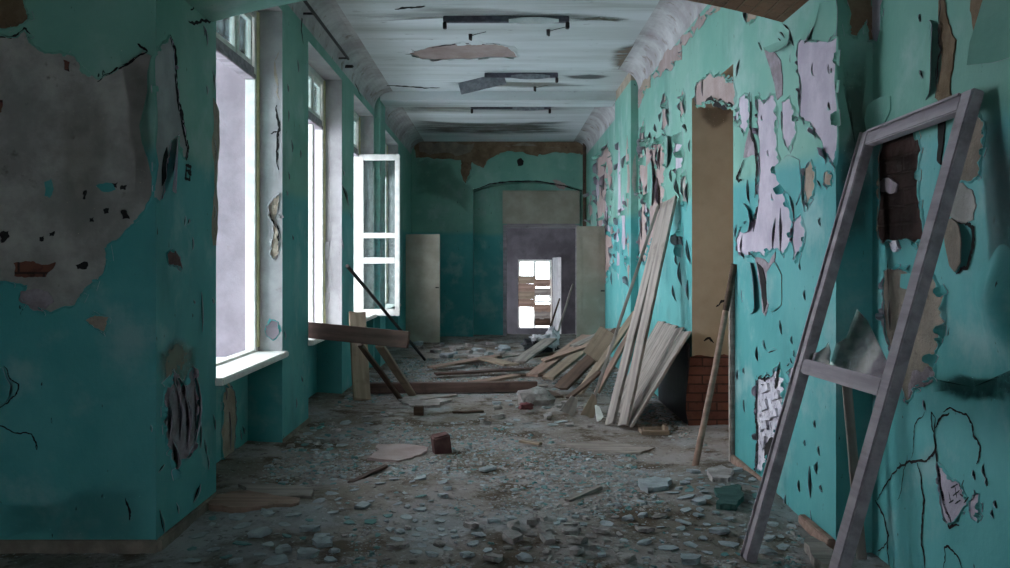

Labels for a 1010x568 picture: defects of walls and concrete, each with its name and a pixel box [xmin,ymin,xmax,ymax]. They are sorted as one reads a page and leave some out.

crack [97,43,148,82]
spalling [0,0,189,316]
crack [271,105,281,170]
spalling [267,173,294,261]
spalling [404,0,884,556]
spalling [875,131,925,351]
spalling [902,274,948,410]
crack [0,425,38,450]
spalling [150,366,245,481]
crack [875,407,981,568]